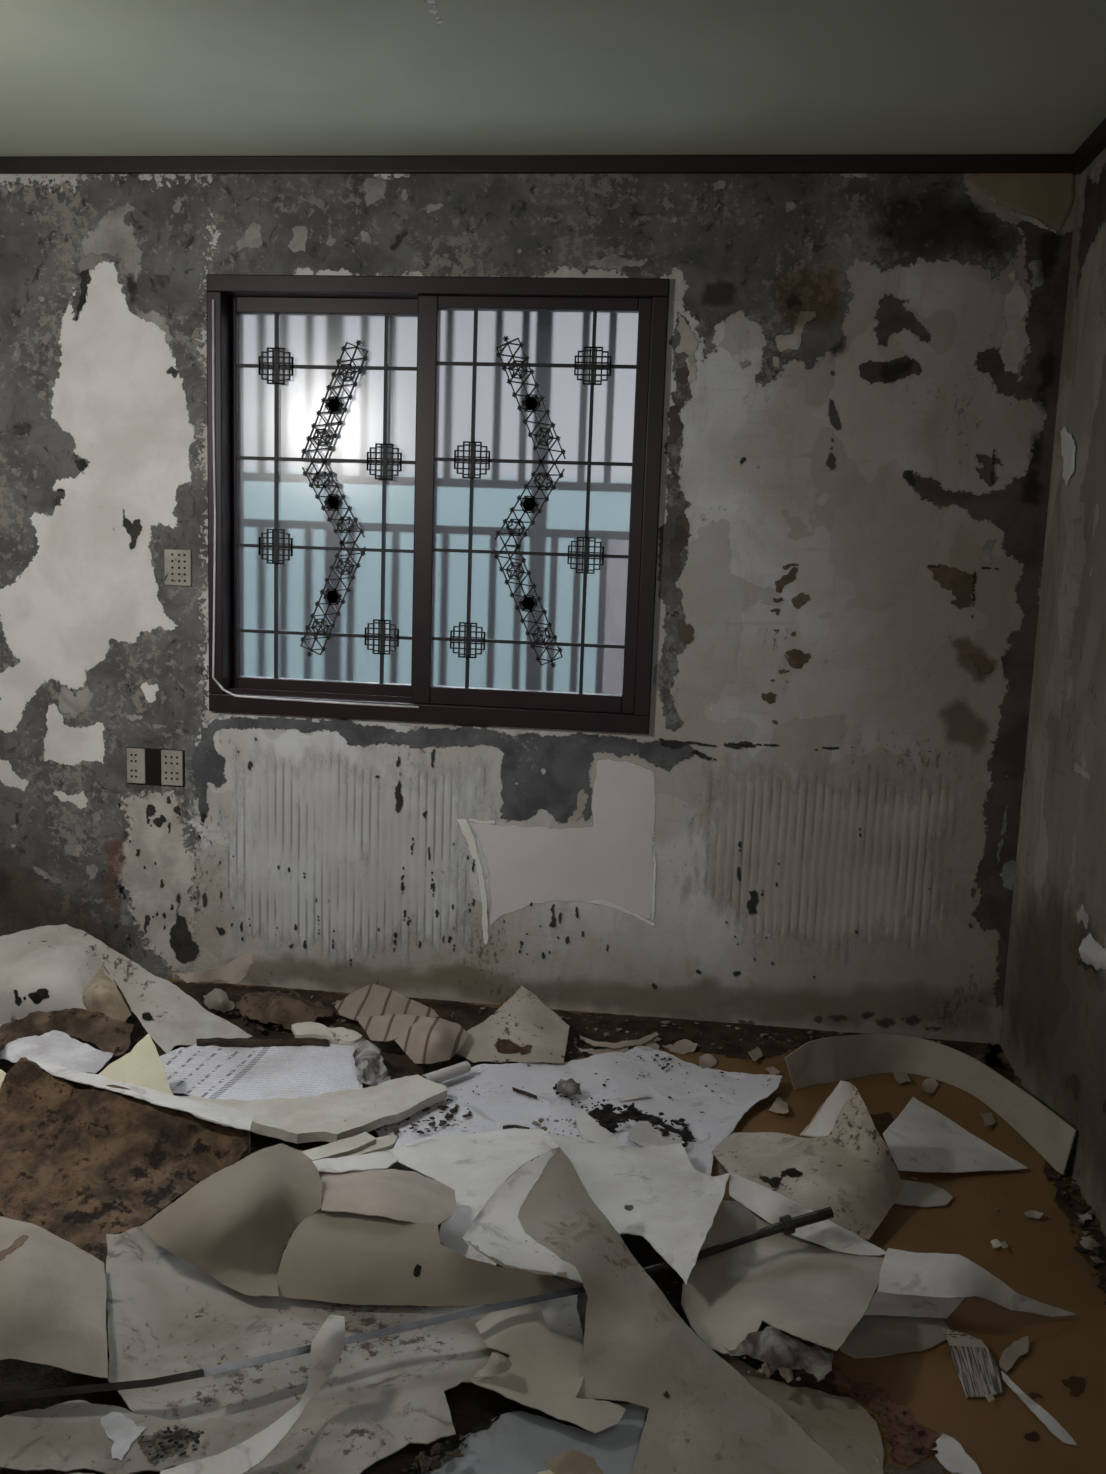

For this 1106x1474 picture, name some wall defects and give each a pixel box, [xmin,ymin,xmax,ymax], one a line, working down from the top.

peeling [0,163,1106,1010]
damp [0,787,251,979]
damp [275,898,335,949]